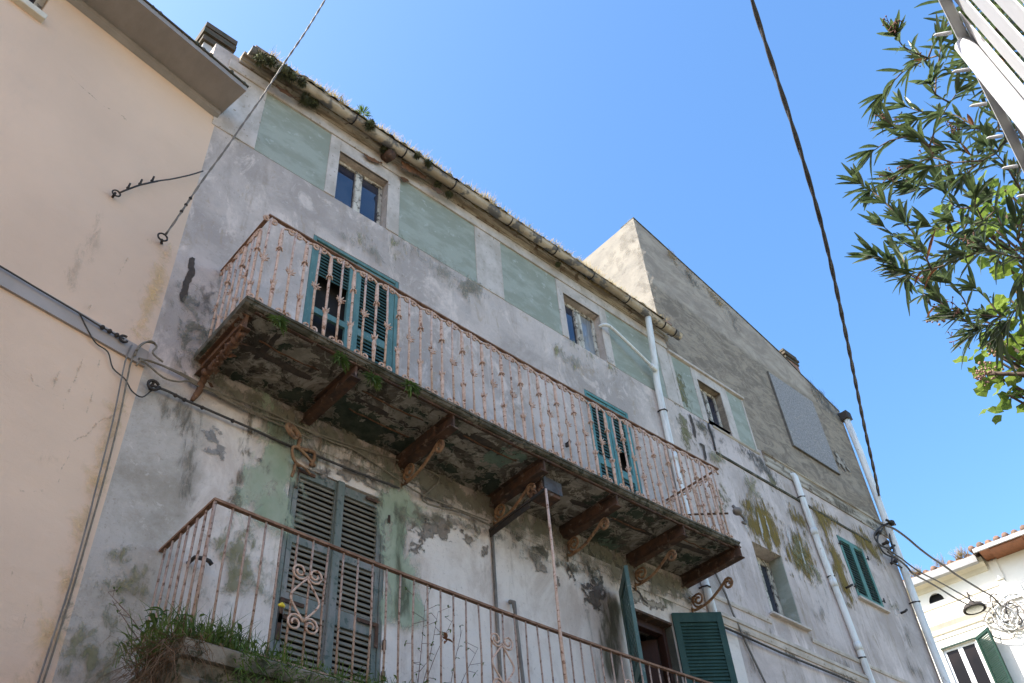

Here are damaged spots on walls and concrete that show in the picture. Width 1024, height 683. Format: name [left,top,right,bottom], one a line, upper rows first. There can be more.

peeling [234,312,328,368]
damp [229,472,245,507]
peeling [218,357,489,629]
flaking render [528,553,610,614]